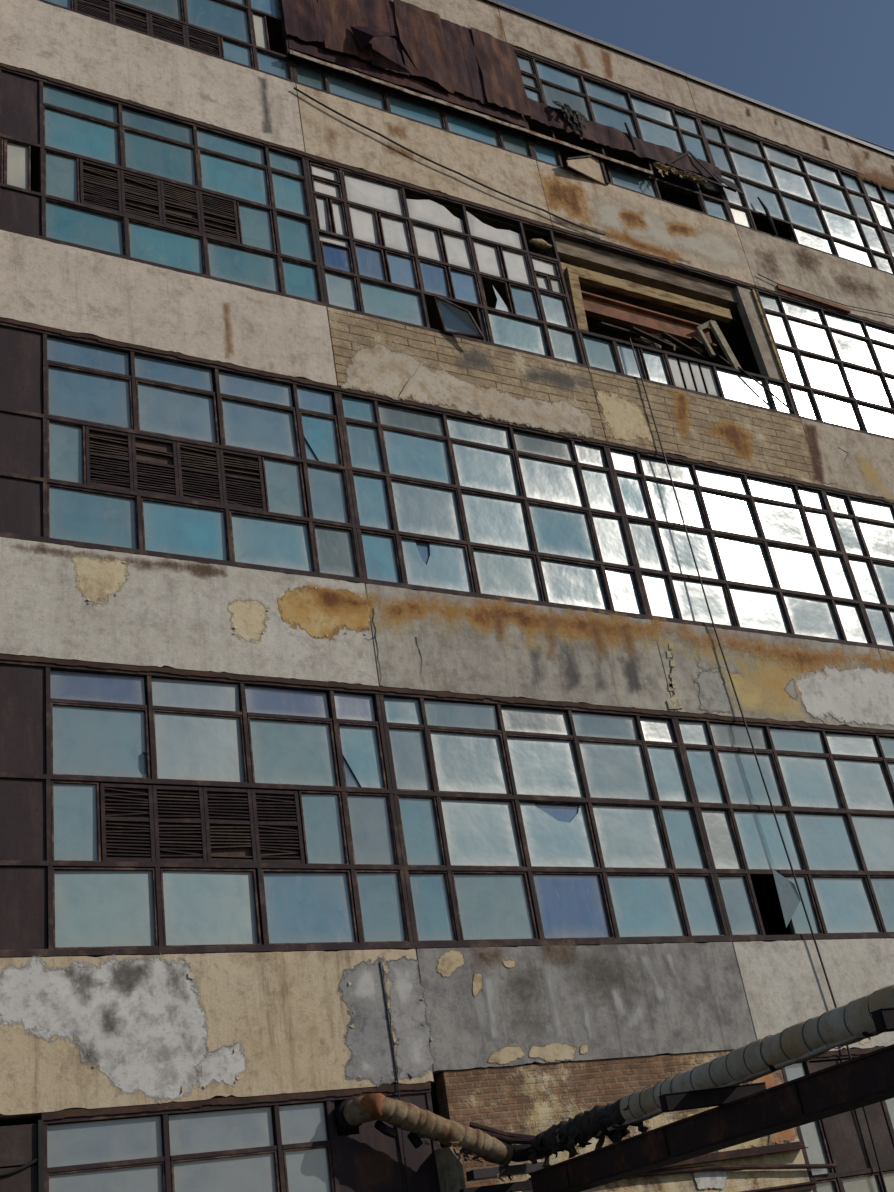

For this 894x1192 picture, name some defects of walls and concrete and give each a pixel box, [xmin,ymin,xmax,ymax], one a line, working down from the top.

rust [537,173,590,222]
rust [608,209,679,262]
rust [667,222,695,236]
peeling [340,342,655,443]
rust [710,422,753,460]
peeling [227,585,375,644]
crack [365,608,381,674]
rust [372,592,894,707]
peeling [695,643,894,726]
peeling [0,955,247,1104]
peeling [338,956,436,1087]
flaking render [718,1127,797,1152]